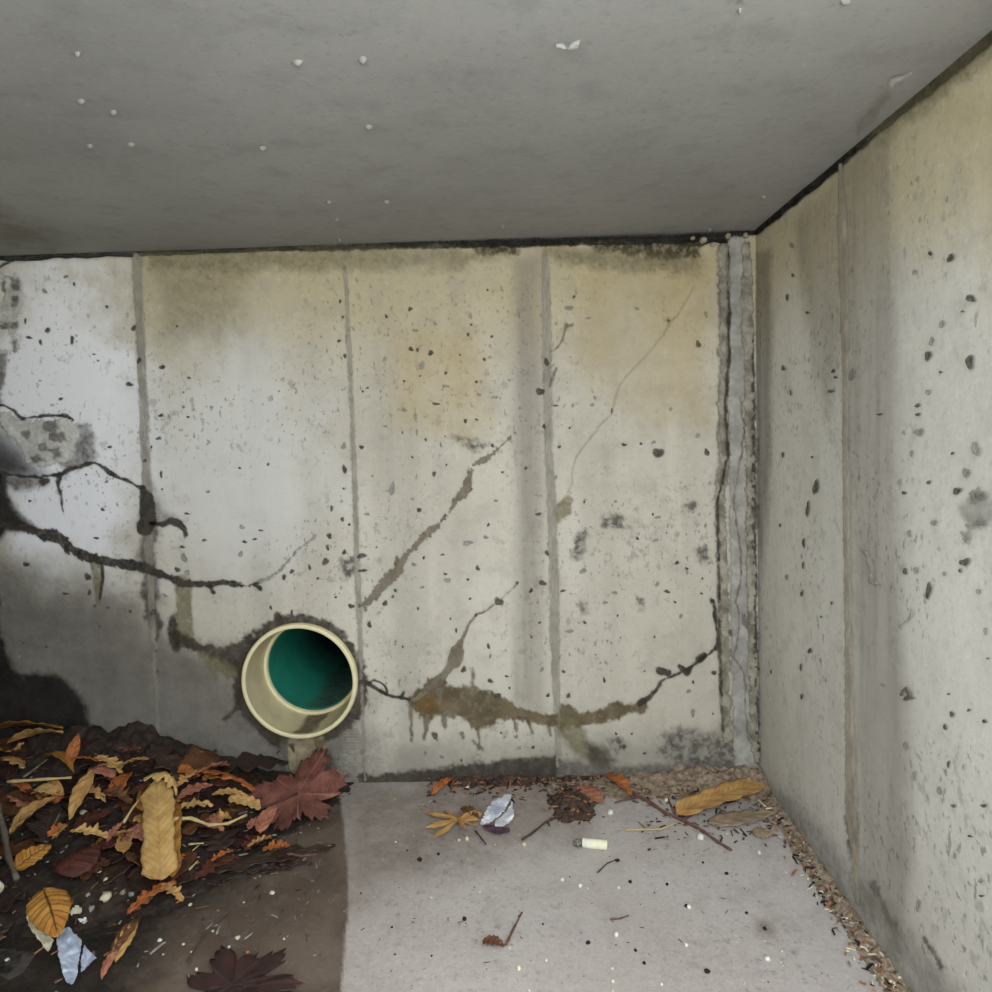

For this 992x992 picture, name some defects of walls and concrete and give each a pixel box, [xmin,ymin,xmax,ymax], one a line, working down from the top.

crack [0,30,992,752]
damp [0,442,40,536]
peeling [0,412,77,467]
damp [65,425,95,468]
damp [0,520,734,782]